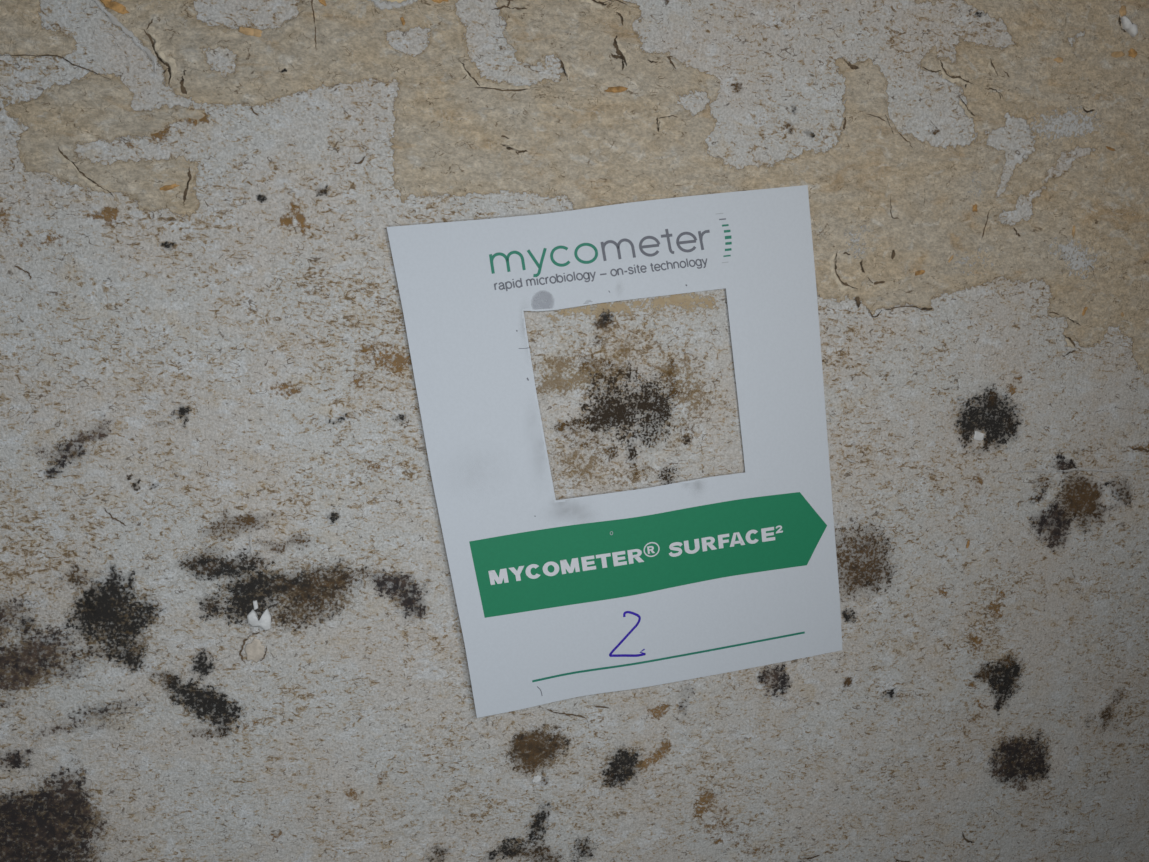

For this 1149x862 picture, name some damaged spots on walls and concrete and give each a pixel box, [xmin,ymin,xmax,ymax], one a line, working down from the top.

peeling [0,0,1149,374]
damp [534,310,716,491]
damp [956,384,1022,453]
damp [1029,451,1132,552]
damp [178,510,429,636]
damp [835,517,898,622]
damp [0,565,245,739]
damp [974,655,1025,715]
damp [0,766,107,862]
damp [501,724,571,785]
damp [489,803,598,862]
damp [599,744,643,787]